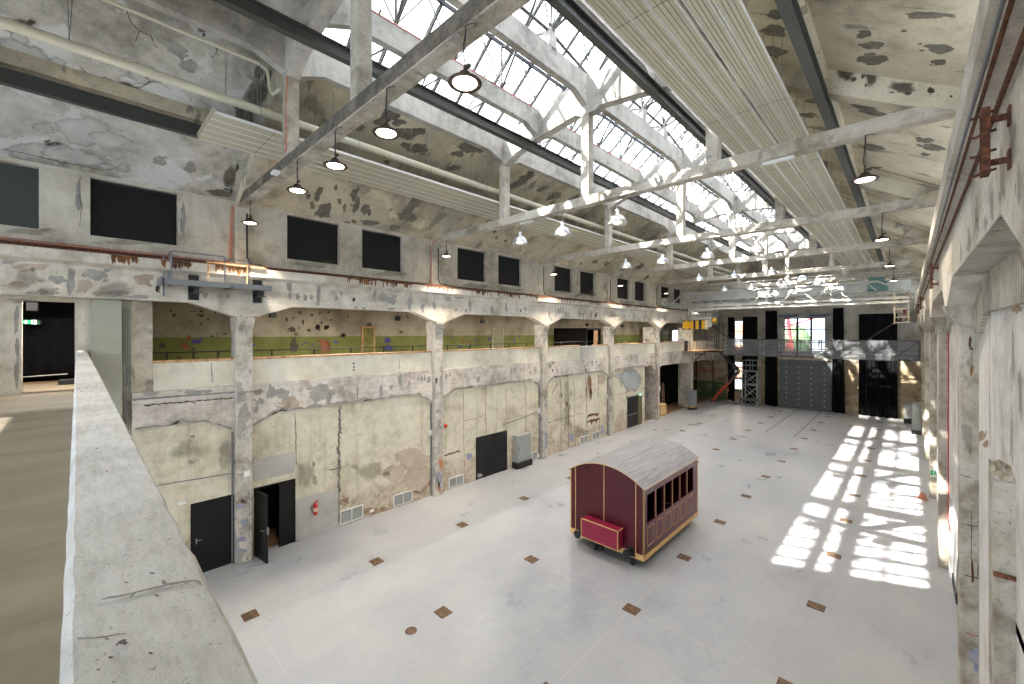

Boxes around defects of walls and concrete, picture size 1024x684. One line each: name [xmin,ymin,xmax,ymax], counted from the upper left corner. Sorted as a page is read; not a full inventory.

crack [126,11,157,48]
water stain [838,71,876,87]
water stain [889,83,913,95]
peeling [307,188,339,218]
peeling [345,187,371,222]
corrosion [111,255,138,265]
corrosion [161,260,191,269]
corrosion [215,265,253,275]
peeling [381,447,443,495]